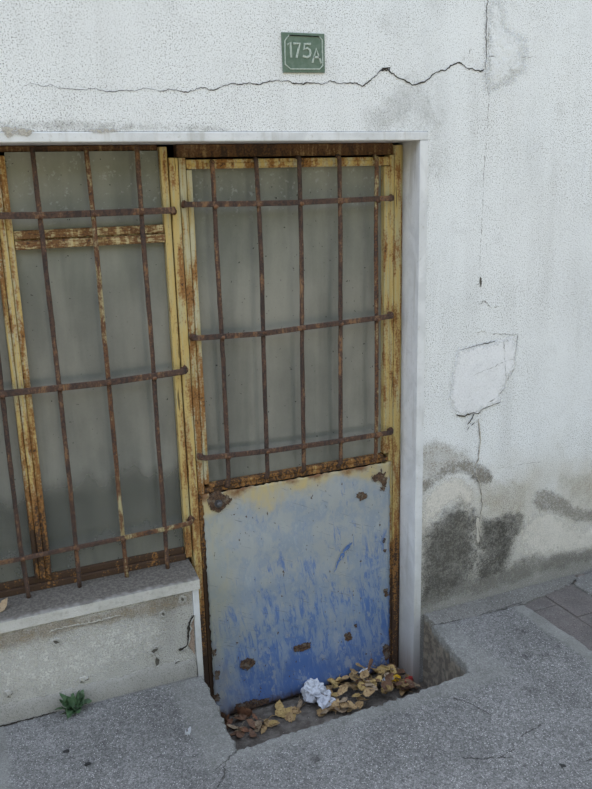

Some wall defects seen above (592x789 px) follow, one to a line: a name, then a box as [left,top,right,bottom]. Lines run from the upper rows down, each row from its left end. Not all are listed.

crack [31,0,494,253]
peeling [450,329,519,417]
rust [207,490,232,512]
rust [371,472,388,491]
crack [467,414,483,545]
damp [422,446,592,599]
rust [240,658,256,671]
rust [293,642,311,652]